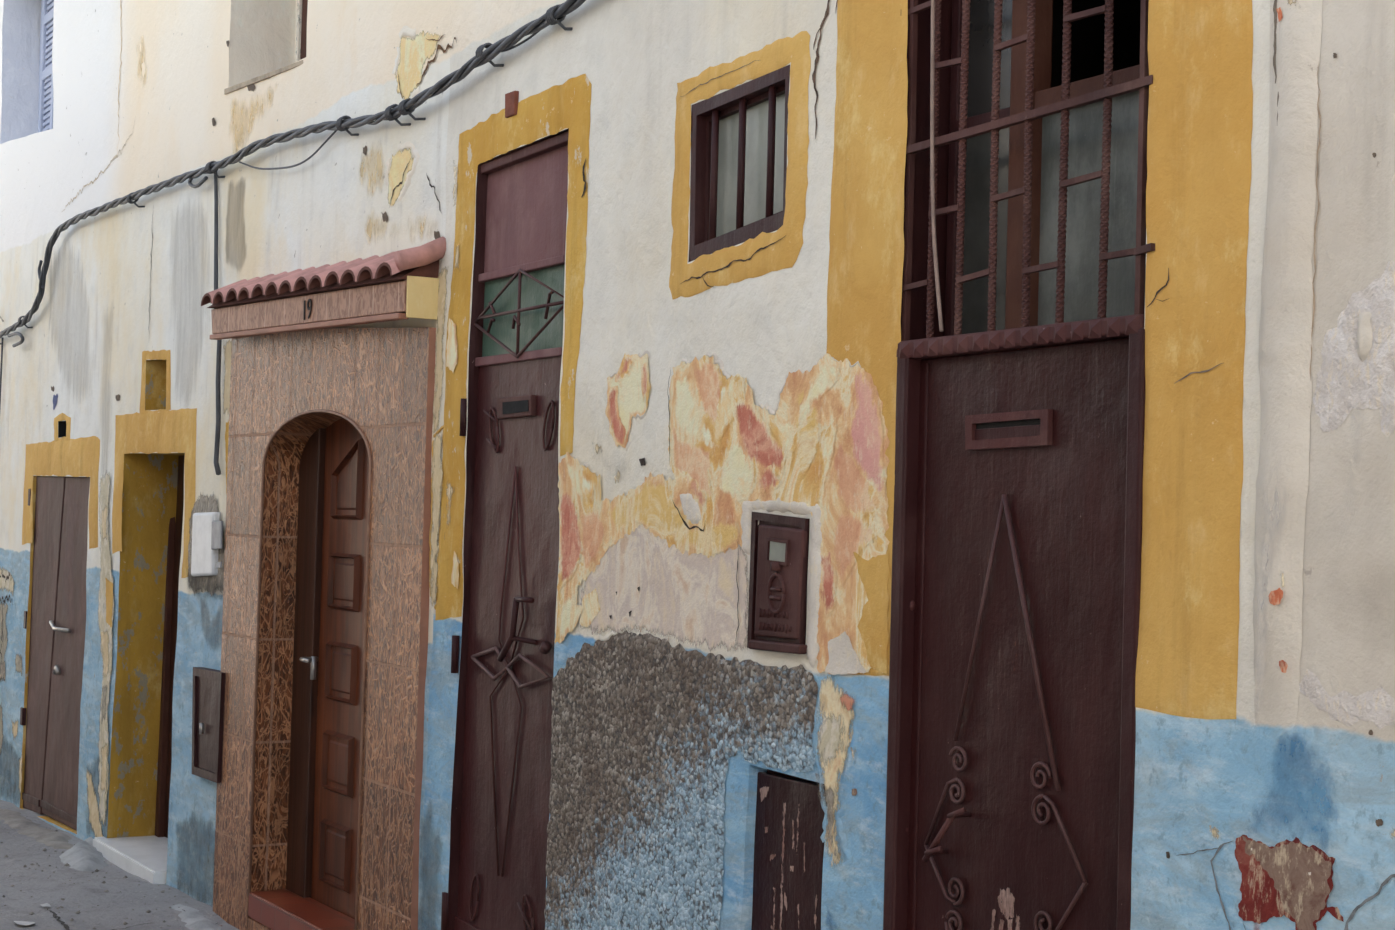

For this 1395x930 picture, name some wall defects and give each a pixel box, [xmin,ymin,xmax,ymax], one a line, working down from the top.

peeling [392,26,457,99]
crack [812,0,838,139]
peeling [381,141,420,222]
crack [1147,268,1170,307]
crack [1174,363,1222,384]
flaking render [544,350,890,930]
crack [1176,841,1246,930]
peeling [1235,835,1344,930]
crack [1344,874,1395,930]